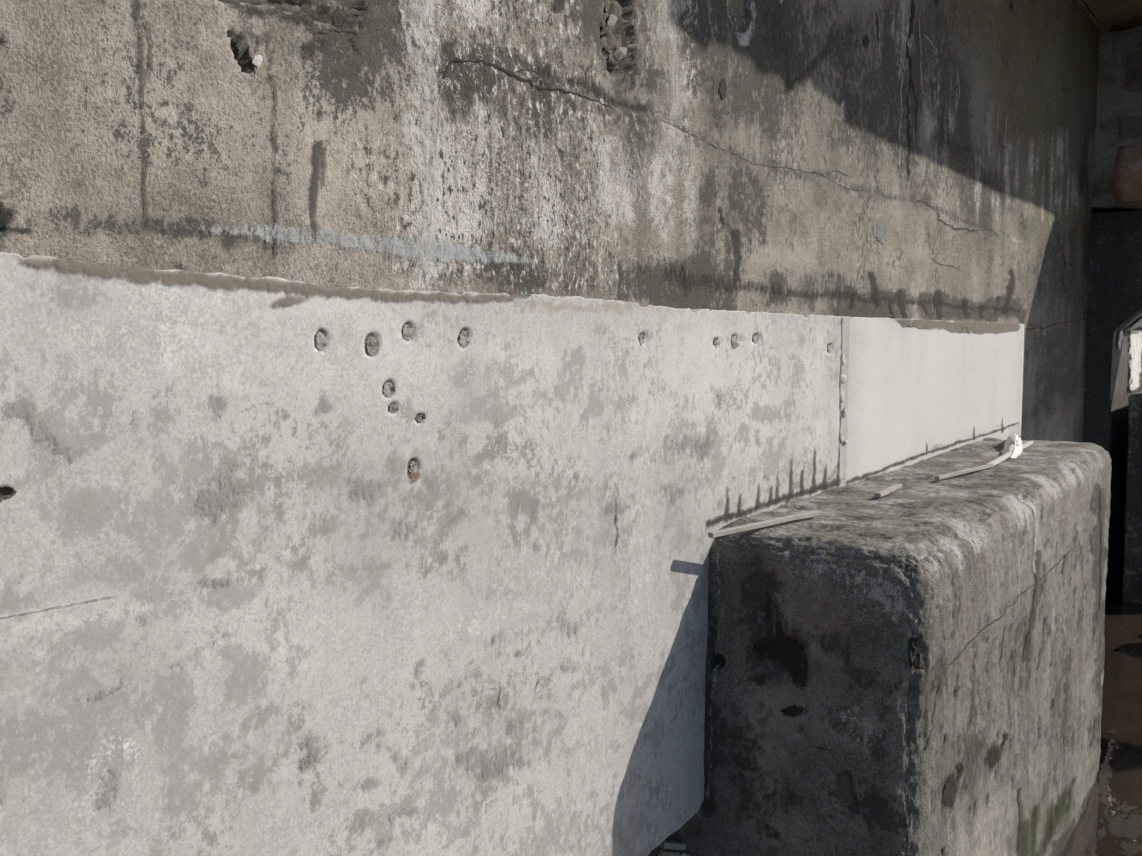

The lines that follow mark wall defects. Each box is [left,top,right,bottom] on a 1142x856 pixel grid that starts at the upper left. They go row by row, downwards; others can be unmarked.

spalling [600,0,635,70]
crack [656,115,863,193]
crack [875,0,999,236]
damp [719,207,743,283]
damp [869,272,911,319]
damp [962,268,1015,319]
spalling [751,592,808,688]
crack [924,549,1072,751]
spalling [780,704,808,717]